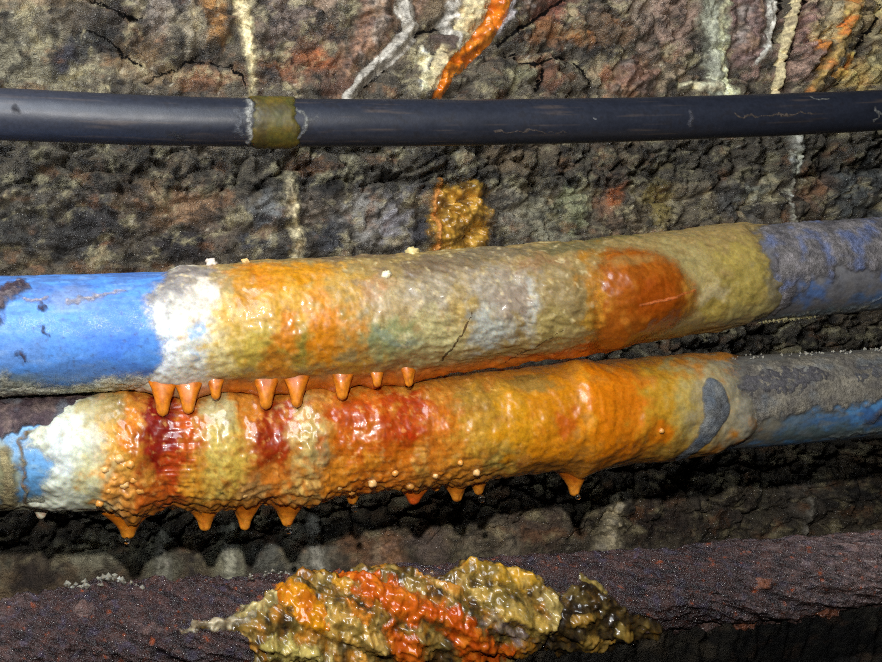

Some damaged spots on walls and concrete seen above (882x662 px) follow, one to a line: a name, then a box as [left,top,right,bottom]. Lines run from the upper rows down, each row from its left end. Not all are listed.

damp [342,0,419,99]
rust [427,177,494,251]